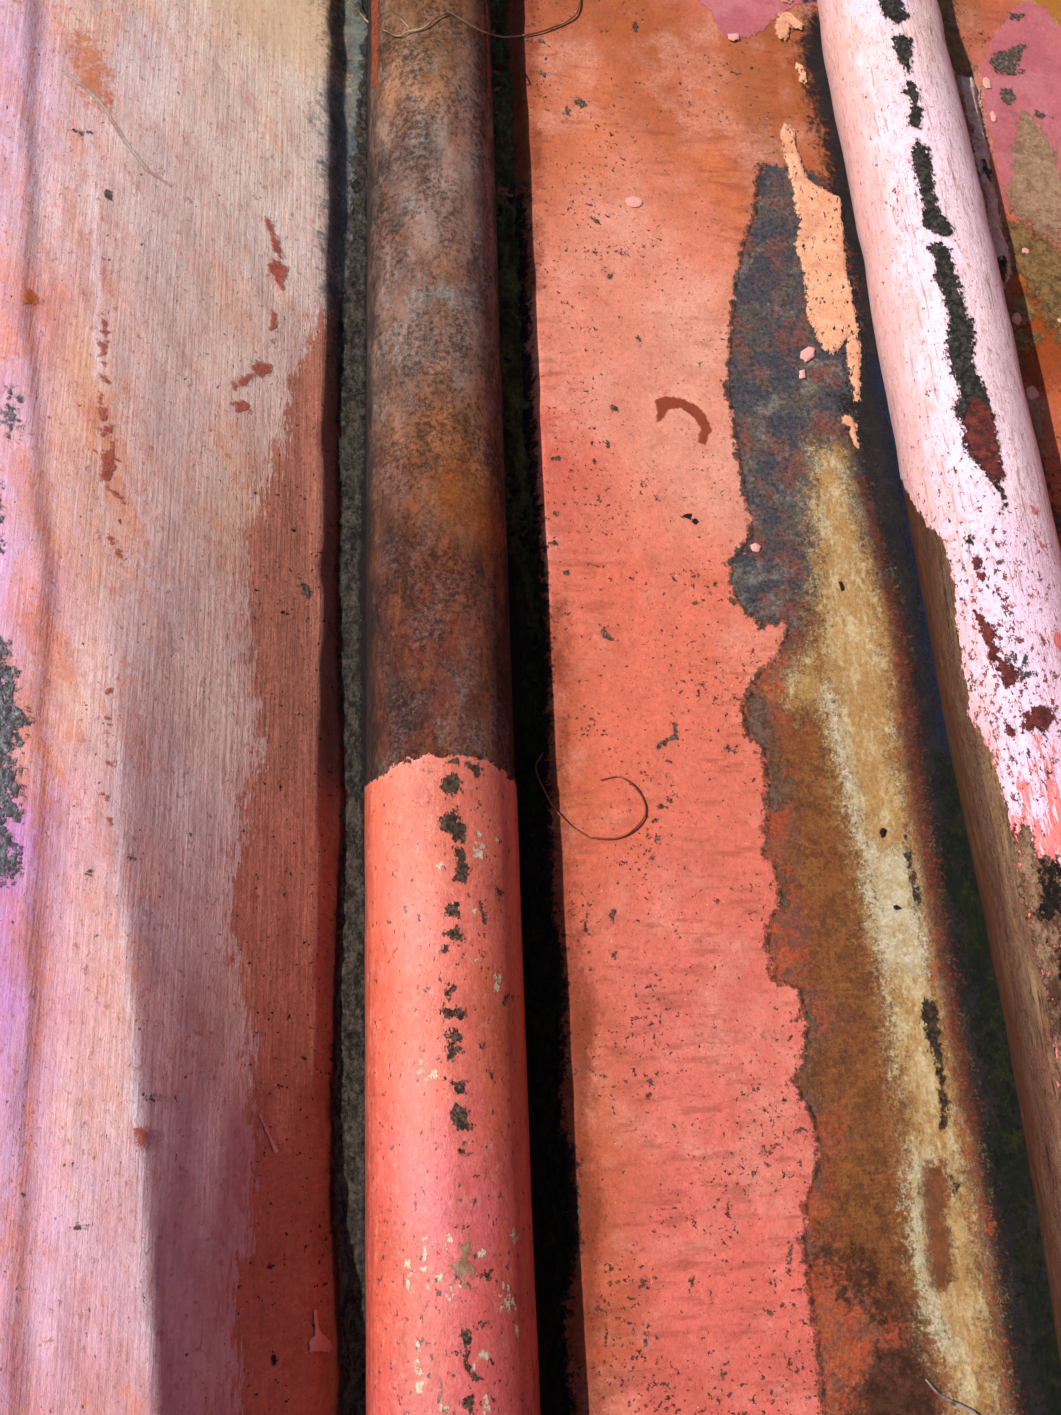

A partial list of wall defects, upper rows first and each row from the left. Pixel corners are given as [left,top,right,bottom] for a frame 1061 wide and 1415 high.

rust [402,273,475,325]
peeling [773,0,803,40]
peeling [878,0,1008,515]
peeling [937,0,1061,380]
peeling [1026,398,1061,535]
peeling [0,636,34,889]
peeling [439,983,486,1156]
peeling [439,757,489,954]
water stain [497,0,584,1415]
peeling [722,123,1030,1415]
water stain [700,0,1061,1415]
rust [773,435,1013,1415]